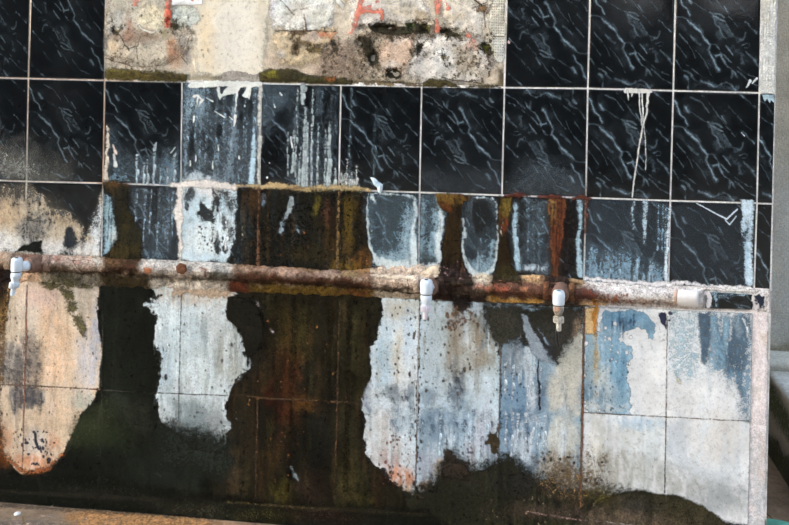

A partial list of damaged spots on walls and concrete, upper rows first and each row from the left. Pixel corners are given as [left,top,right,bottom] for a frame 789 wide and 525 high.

flaking render [104,0,236,81]
flaking render [261,0,504,88]
leakage [0,152,117,258]
leakage [103,83,446,280]
corrosion [493,191,592,301]
leakage [0,281,103,476]
leakage [343,187,764,525]